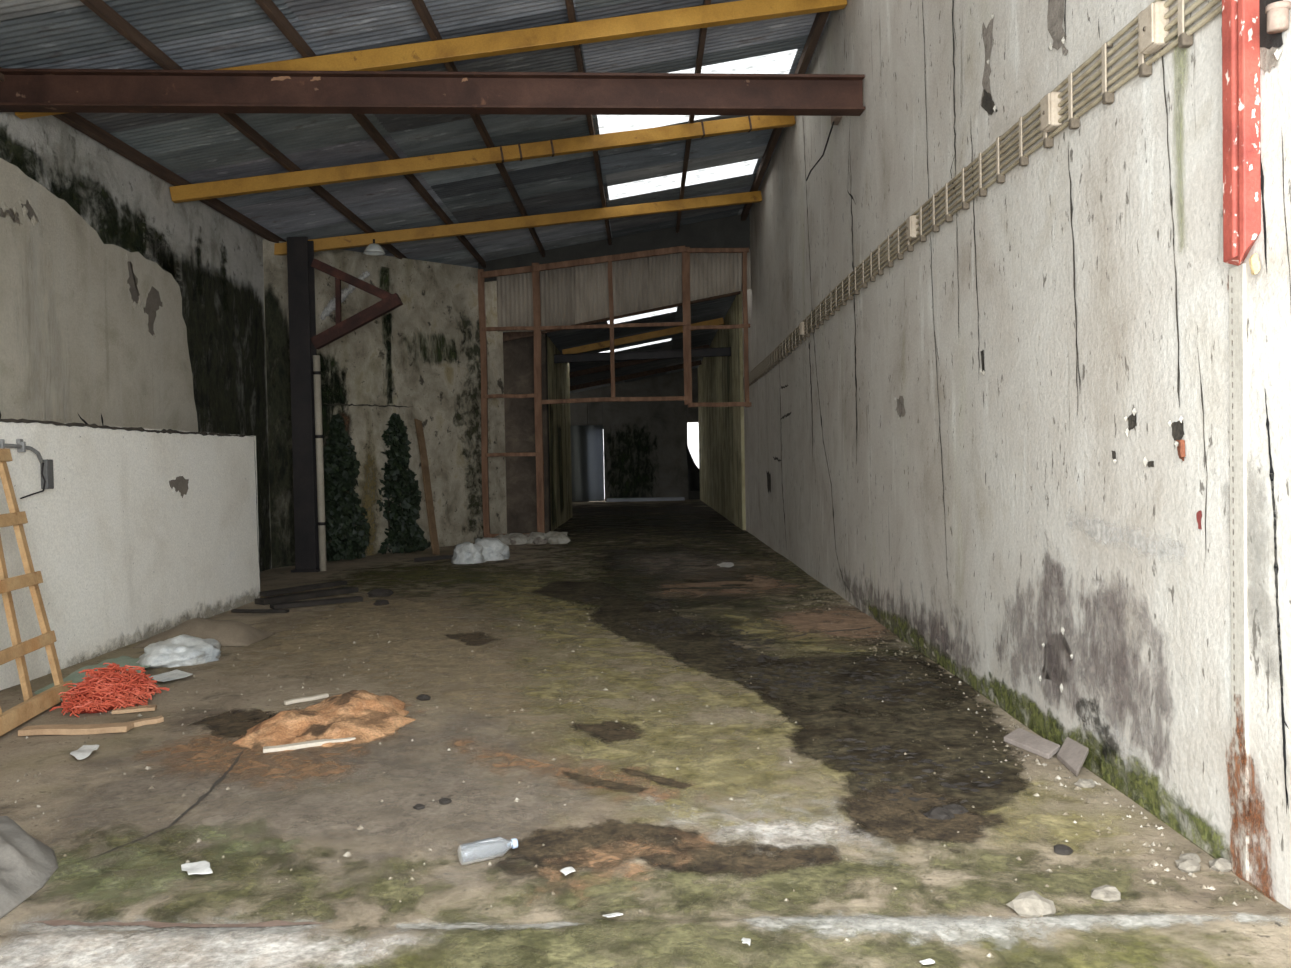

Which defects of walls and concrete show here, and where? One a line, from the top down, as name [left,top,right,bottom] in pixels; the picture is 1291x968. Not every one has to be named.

spalling [980,13,998,116]
spalling [1047,0,1068,56]
spalling [1248,0,1283,84]
peeling [125,253,162,339]
leakage [321,272,369,319]
leakage [0,127,295,572]
leakage [453,314,491,539]
spalling [1124,408,1137,437]
spalling [169,476,190,498]
leakage [360,444,378,556]
leakage [997,557,1172,766]
rust [1226,699,1275,902]